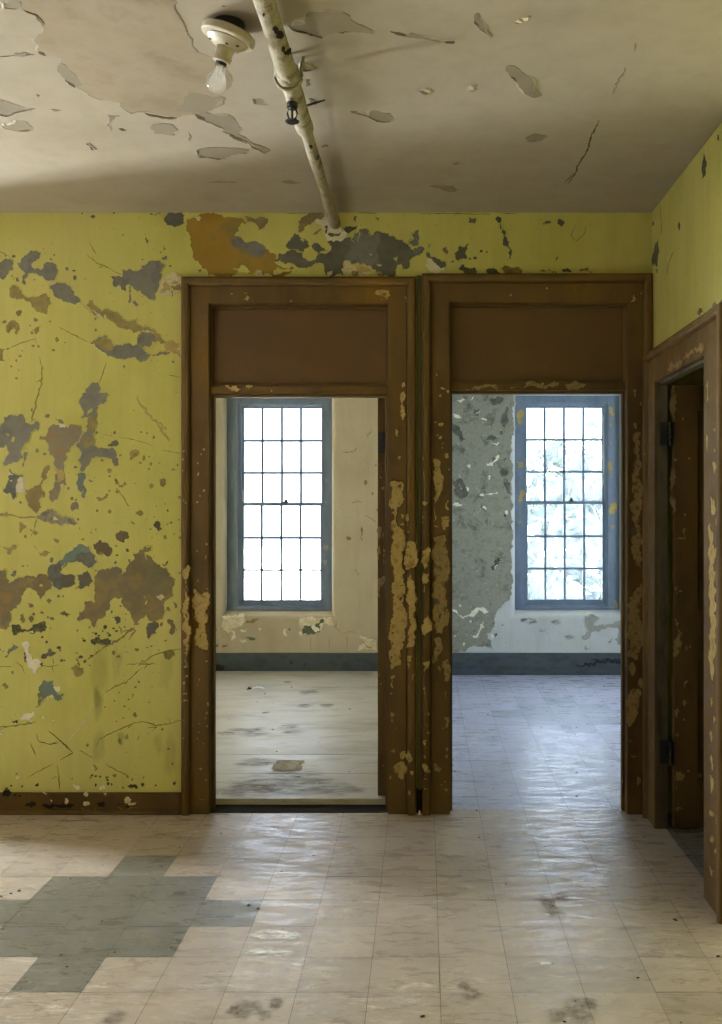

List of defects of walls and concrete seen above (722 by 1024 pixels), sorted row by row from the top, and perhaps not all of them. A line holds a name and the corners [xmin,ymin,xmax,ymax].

peeling [0,0,270,160]
peeling [272,9,376,105]
crack [565,121,599,183]
peeling [0,248,183,379]
peeling [151,212,522,300]
peeling [0,382,261,701]
peeling [357,374,585,699]
peeling [0,641,93,726]
peeling [580,584,643,727]
peeling [708,497,716,742]
spalling [2,764,144,811]
crack [0,719,181,789]